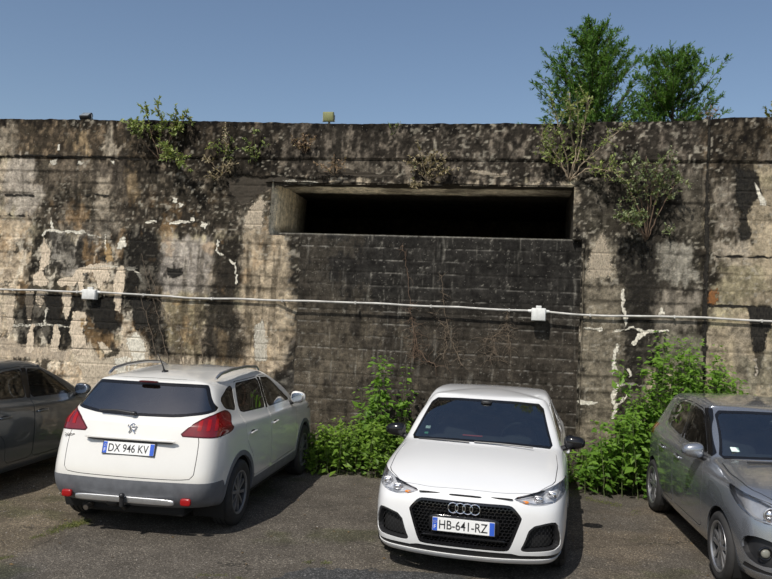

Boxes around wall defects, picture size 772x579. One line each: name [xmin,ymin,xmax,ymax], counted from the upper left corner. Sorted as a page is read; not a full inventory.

leakage [735,168,766,241]
leakage [13,234,152,357]
leakage [167,267,183,278]
leakage [254,321,268,361]
leakage [746,305,772,376]